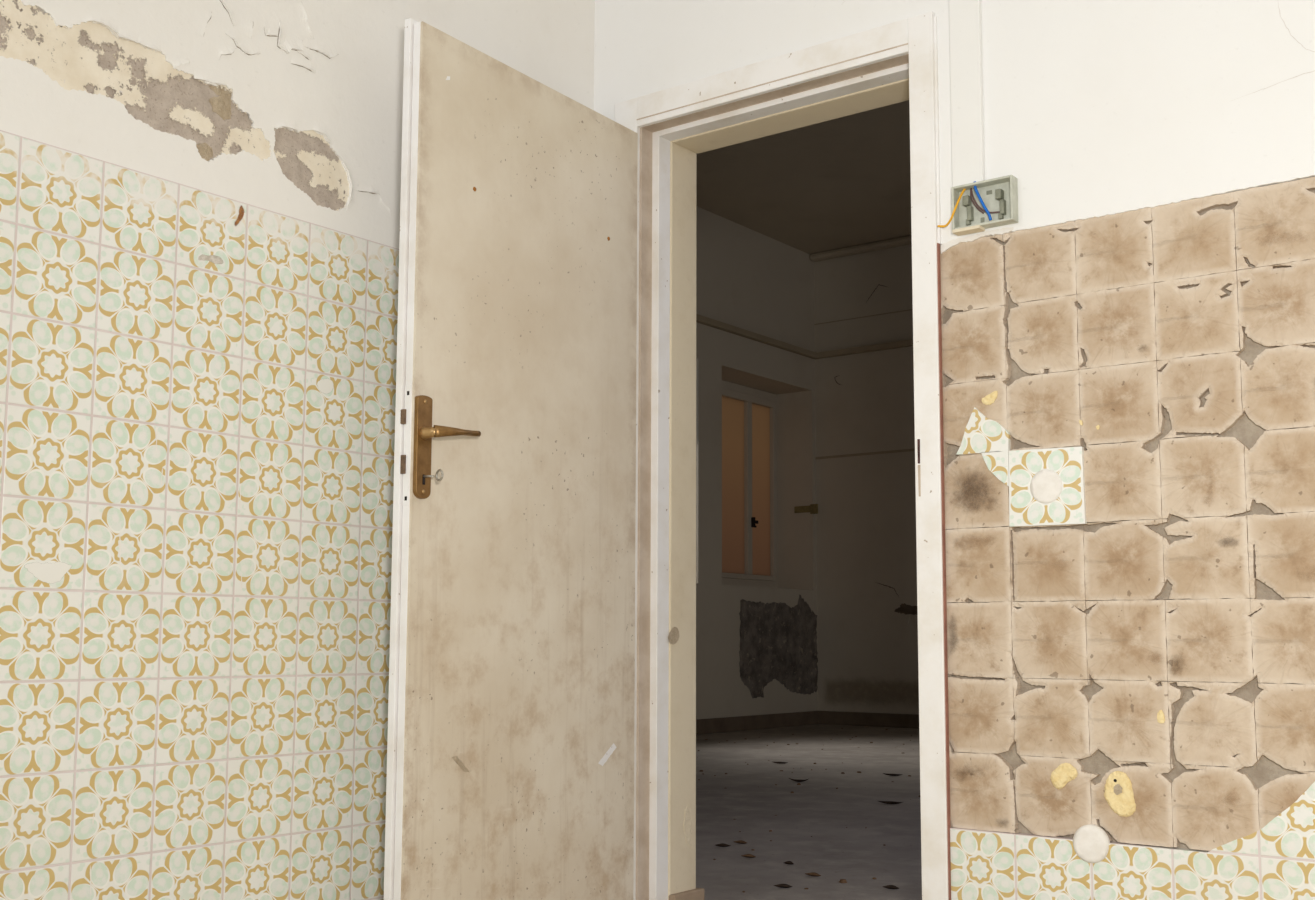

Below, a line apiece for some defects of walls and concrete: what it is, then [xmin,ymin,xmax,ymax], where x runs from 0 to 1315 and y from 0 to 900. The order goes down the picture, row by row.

peeling [0,0,360,216]
peeling [940,177,1315,851]
flaking render [668,627,679,644]
spalling [739,594,818,698]
flaking render [894,603,918,626]